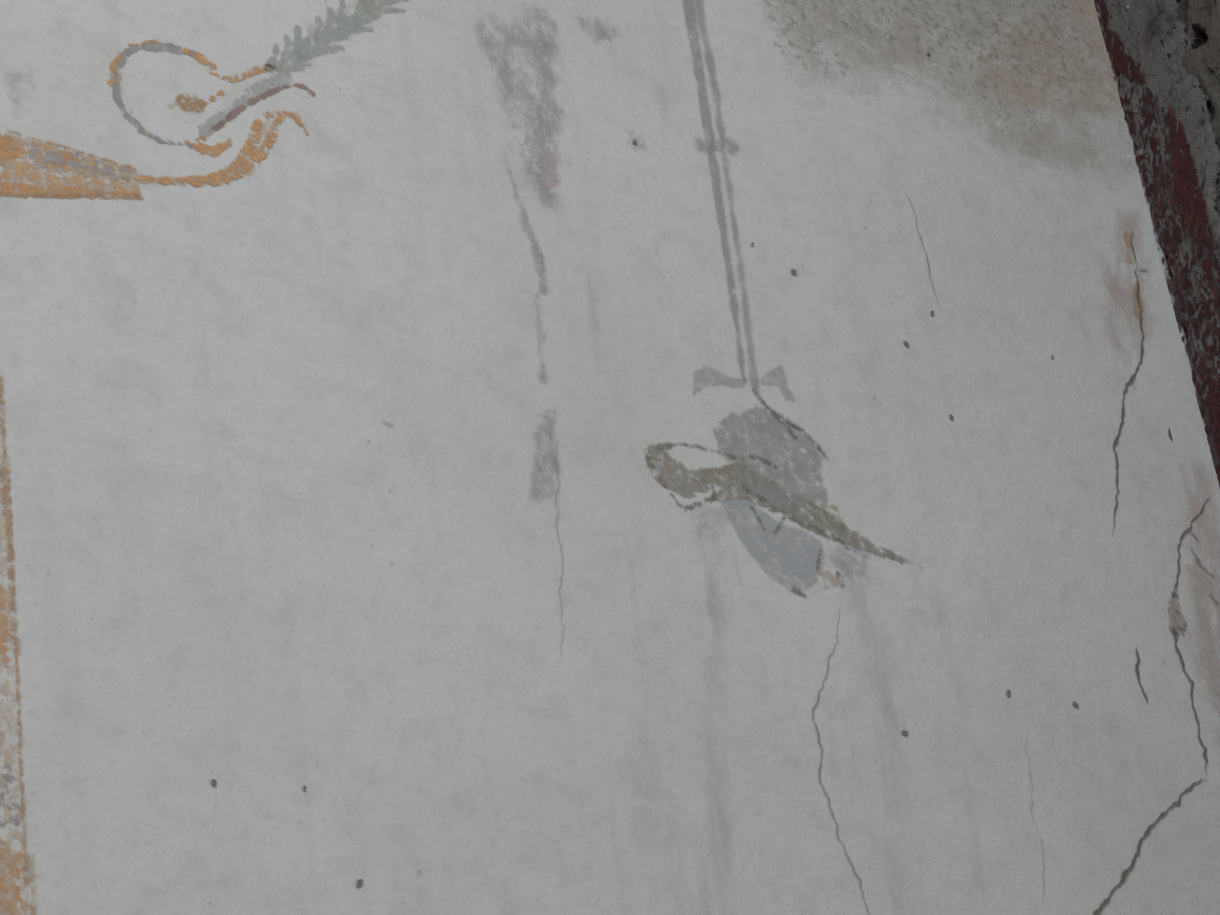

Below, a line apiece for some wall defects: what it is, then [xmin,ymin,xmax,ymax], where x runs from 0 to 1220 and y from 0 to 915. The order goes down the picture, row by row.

spalling [1191,23,1208,49]
crack [1112,231,1147,536]
crack [812,607,871,915]
crack [1093,494,1211,915]